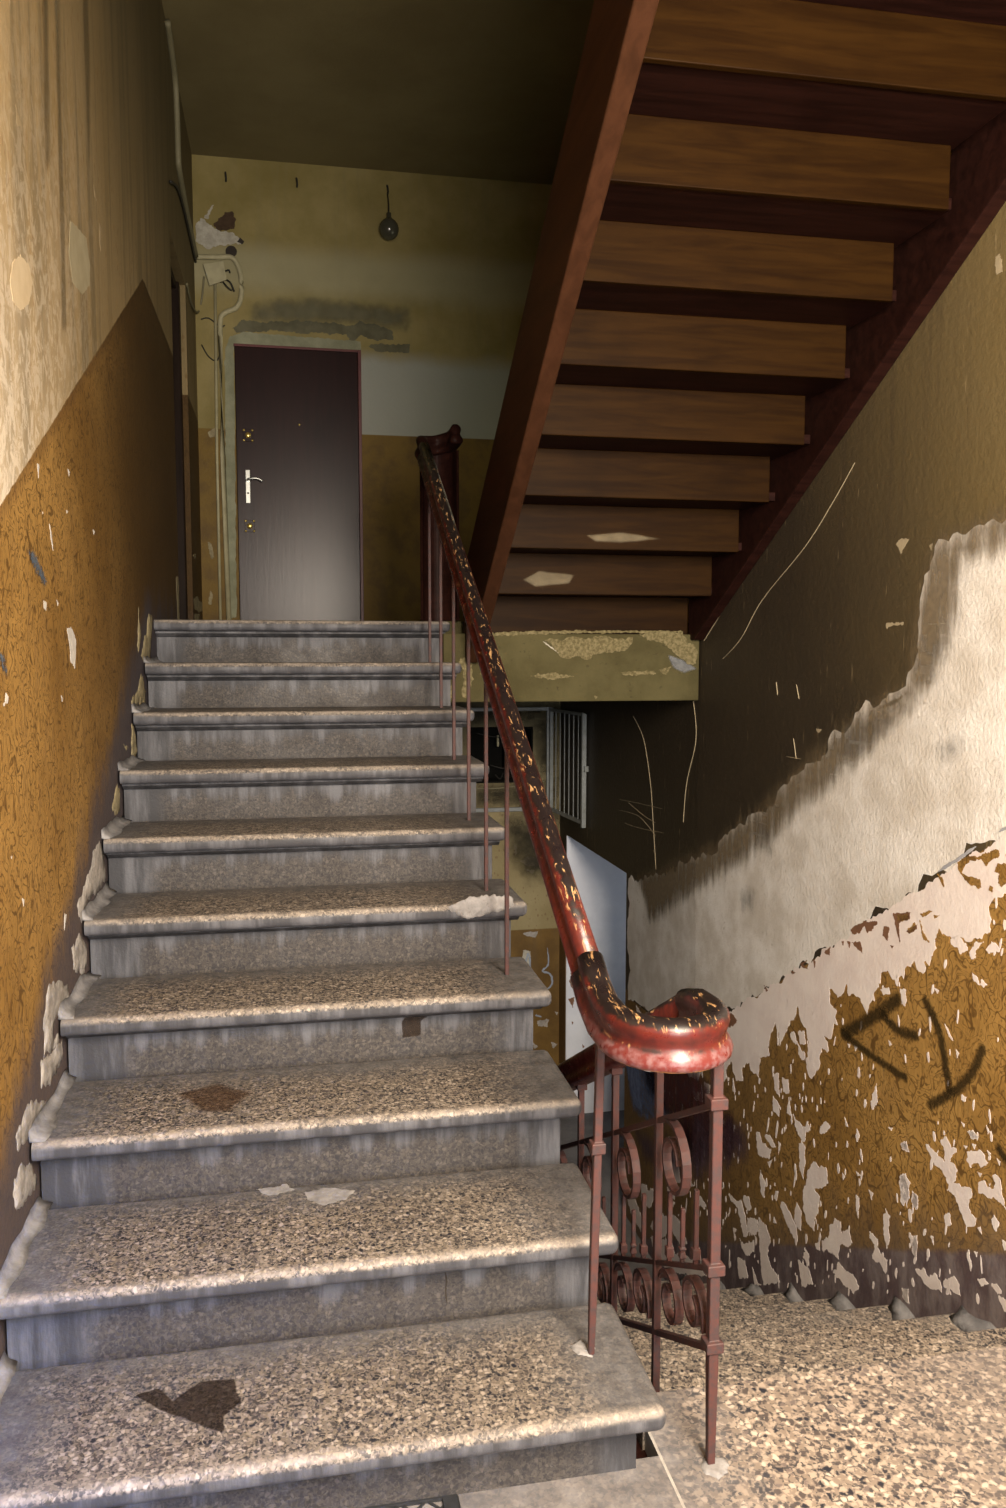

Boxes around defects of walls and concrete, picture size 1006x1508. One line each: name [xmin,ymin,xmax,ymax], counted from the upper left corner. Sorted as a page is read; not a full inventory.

spalling [995,254,1003,274]
leakage [233,301,410,353]
peeling [67,627,76,669]
spalling [131,607,153,705]
spalling [492,617,719,680]
spalling [125,723,138,756]
spalling [112,784,120,815]
flaking render [627,519,1006,1312]
spalling [13,841,106,1210]
peeling [533,973,575,1049]